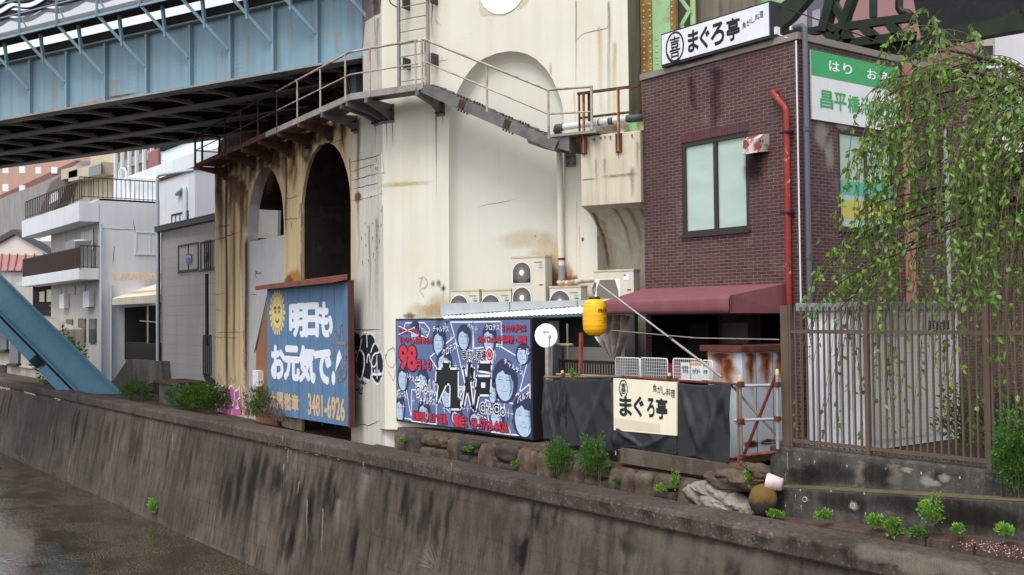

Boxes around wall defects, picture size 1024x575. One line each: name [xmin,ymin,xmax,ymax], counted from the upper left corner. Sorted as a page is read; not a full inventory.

rust [216,121,335,377]
rust [710,352,781,383]